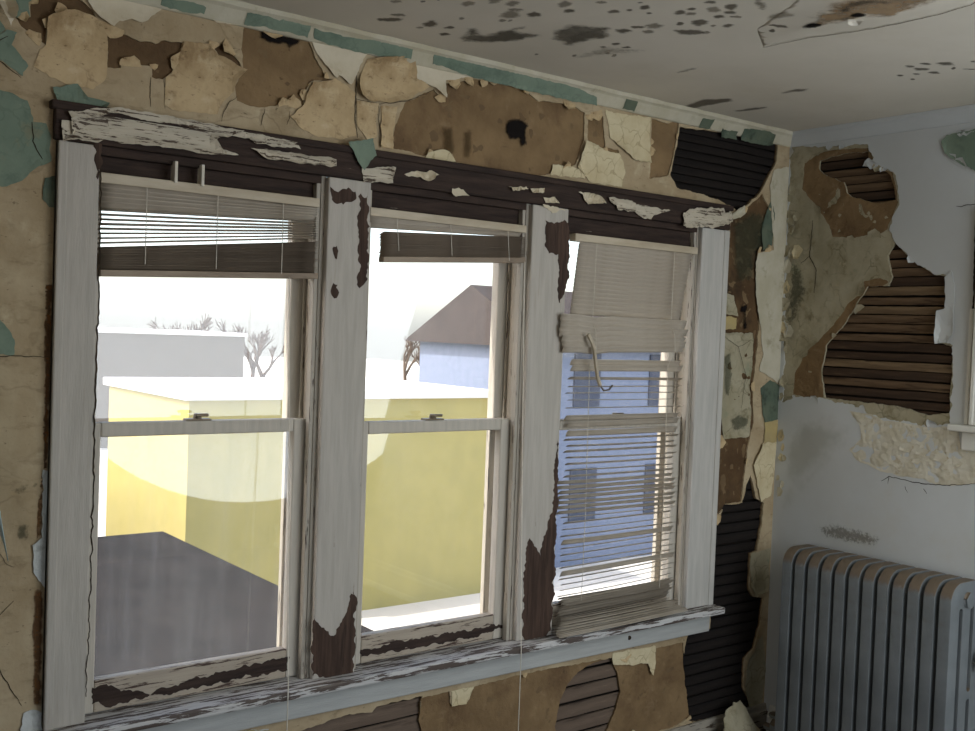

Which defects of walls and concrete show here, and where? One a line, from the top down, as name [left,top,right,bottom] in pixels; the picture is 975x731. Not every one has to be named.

flaking render [0,0,182,79]
flaking render [208,28,367,109]
mould [464,29,536,42]
mould [555,26,643,54]
mould [675,1,737,34]
leakage [803,0,927,28]
peeling [61,107,337,180]
flaking render [393,65,618,176]
peeling [330,187,370,288]
peeling [344,119,975,731]
peeling [311,594,503,678]
peeling [92,657,290,708]